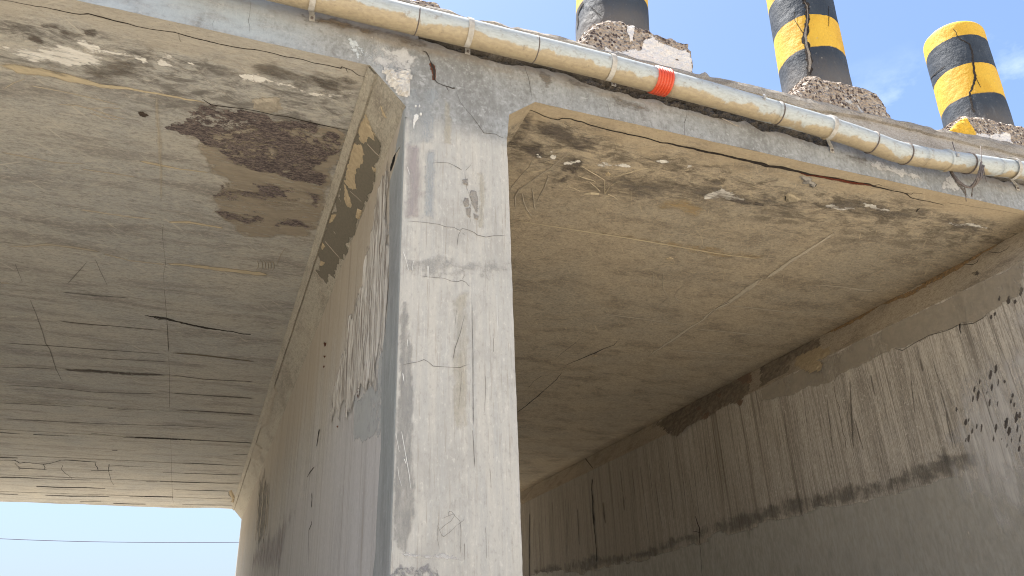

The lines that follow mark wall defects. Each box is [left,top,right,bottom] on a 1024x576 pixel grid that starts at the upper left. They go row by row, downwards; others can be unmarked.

water stain [2,25,173,78]
water stain [239,65,356,97]
water stain [317,18,378,33]
spalling [348,38,415,97]
crack [424,51,503,138]
crack [794,0,813,76]
crack [954,30,981,112]
crack [525,68,1016,214]
spalling [165,105,389,421]
crack [146,315,251,335]
water stain [790,322,1024,512]
crack [4,460,114,485]